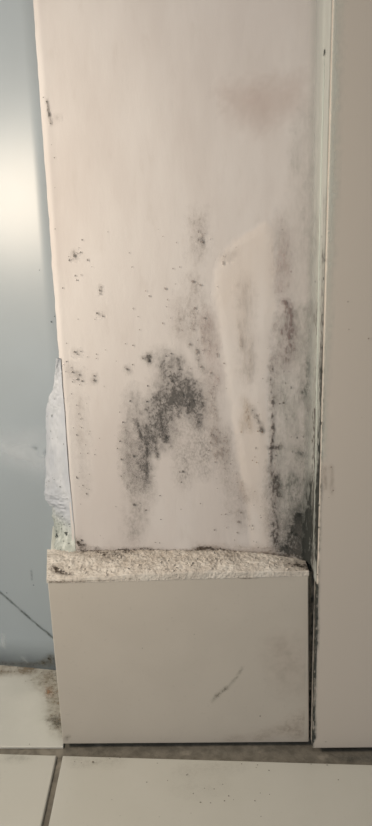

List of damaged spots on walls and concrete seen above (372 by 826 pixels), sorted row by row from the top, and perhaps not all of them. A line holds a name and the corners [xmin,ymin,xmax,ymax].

water stain [133,340,215,482]
water stain [276,300,324,747]